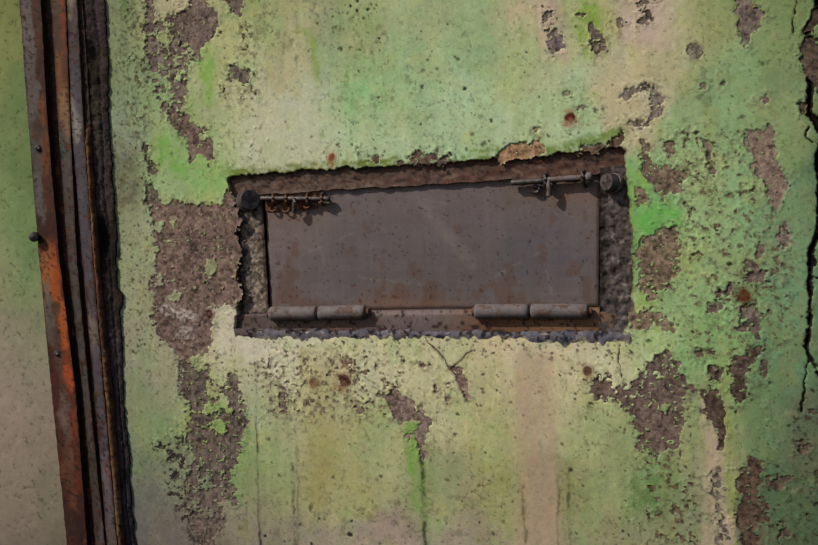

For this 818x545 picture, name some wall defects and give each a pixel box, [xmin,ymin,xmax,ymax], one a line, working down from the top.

peeling [542,6,566,54]
peeling [575,4,609,57]
peeling [636,0,657,26]
peeling [734,0,766,50]
crack [792,0,818,41]
peeling [125,0,219,168]
peeling [223,65,257,99]
crack [800,77,818,412]
peeling [135,132,250,545]
peeling [577,82,794,545]
peeling [255,354,432,461]
peeling [434,366,471,405]